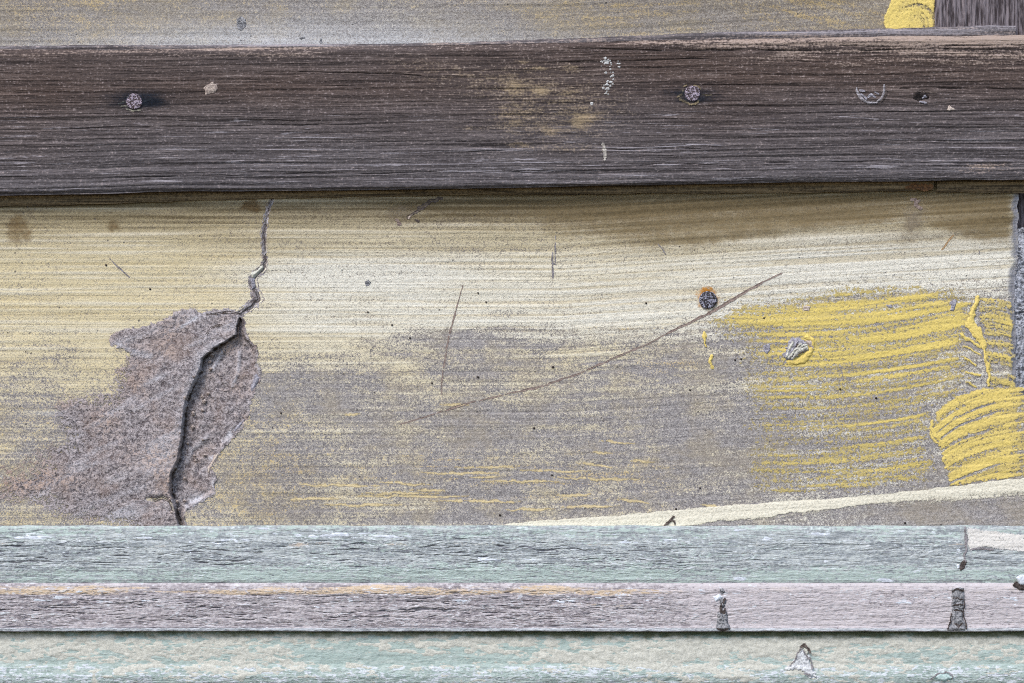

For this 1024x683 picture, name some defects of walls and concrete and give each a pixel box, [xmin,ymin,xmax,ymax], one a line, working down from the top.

crack [201,198,274,339]
spalling [165,310,262,553]
crack [151,488,183,525]